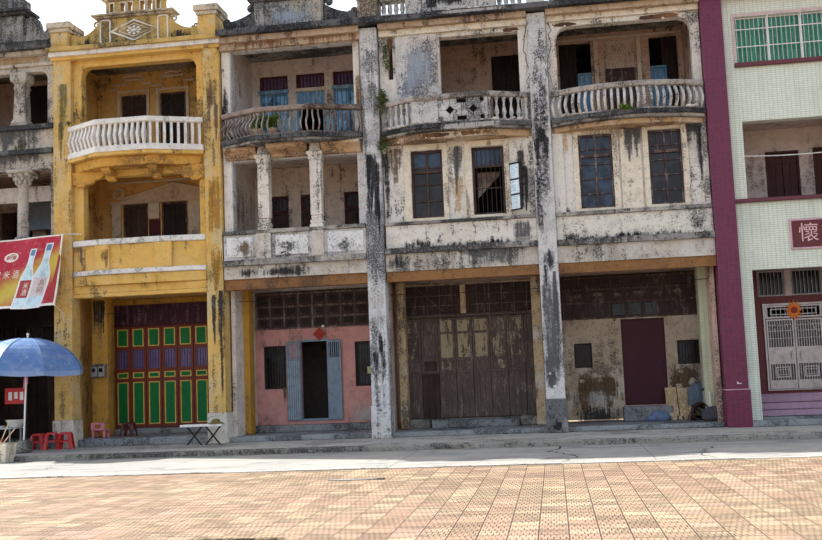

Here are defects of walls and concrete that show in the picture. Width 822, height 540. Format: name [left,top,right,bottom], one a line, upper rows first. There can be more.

leakage [365,148,402,234]
leakage [443,73,551,265]
leakage [239,265,310,277]
leakage [389,239,430,268]
leakage [211,290,225,398]
leakage [542,249,561,387]
leakage [578,375,620,422]